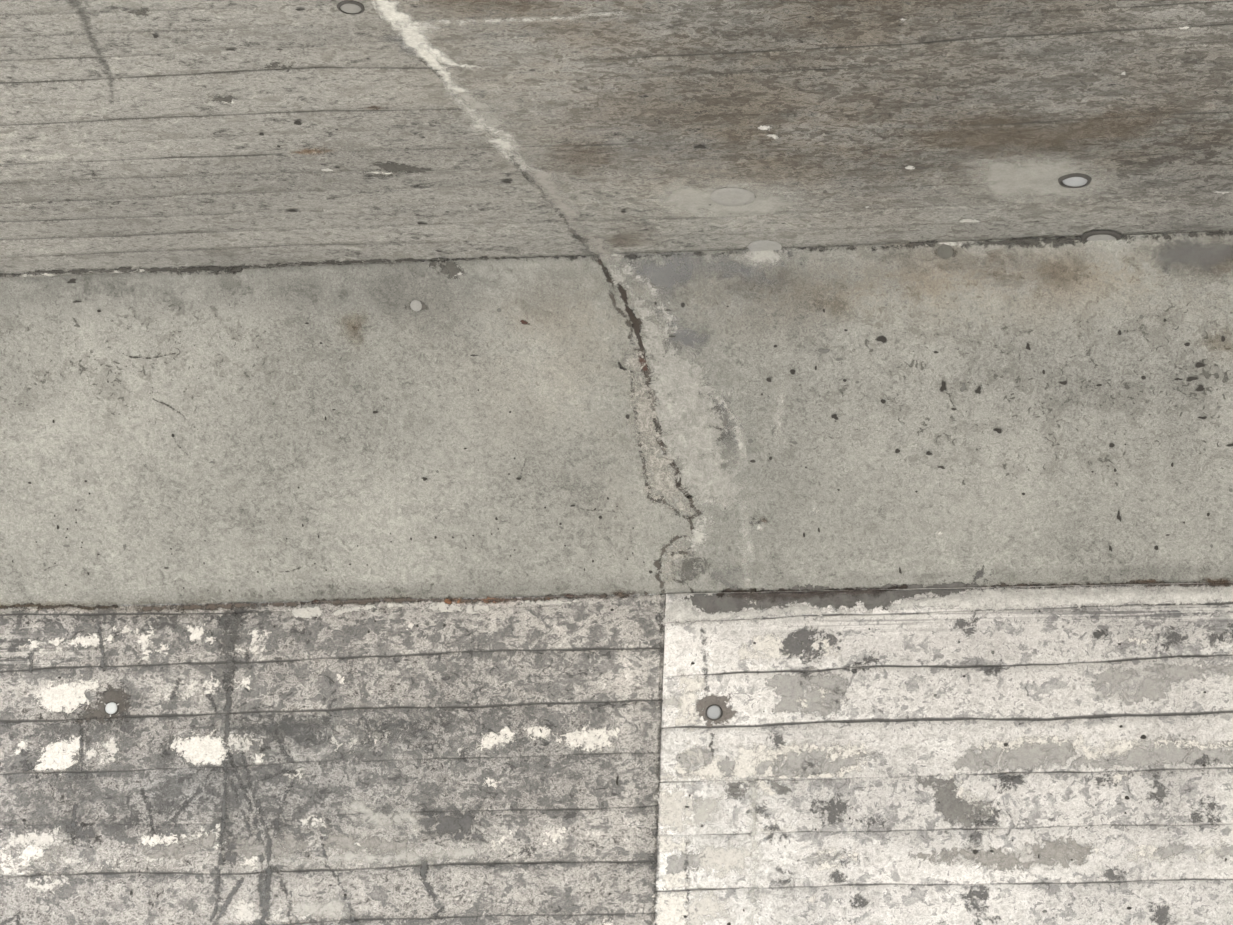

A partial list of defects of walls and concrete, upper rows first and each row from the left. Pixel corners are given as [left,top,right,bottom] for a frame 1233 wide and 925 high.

leakage [374,0,577,222]
crack [416,54,702,925]
peeling [18,624,172,661]
crack [701,629,709,690]
spalling [661,540,1053,717]
peeling [31,674,103,715]
peeling [14,735,123,777]
peeling [170,729,265,770]
peeling [453,721,624,756]
peeling [652,671,879,925]
peeling [0,801,529,895]
peeling [908,836,1093,872]